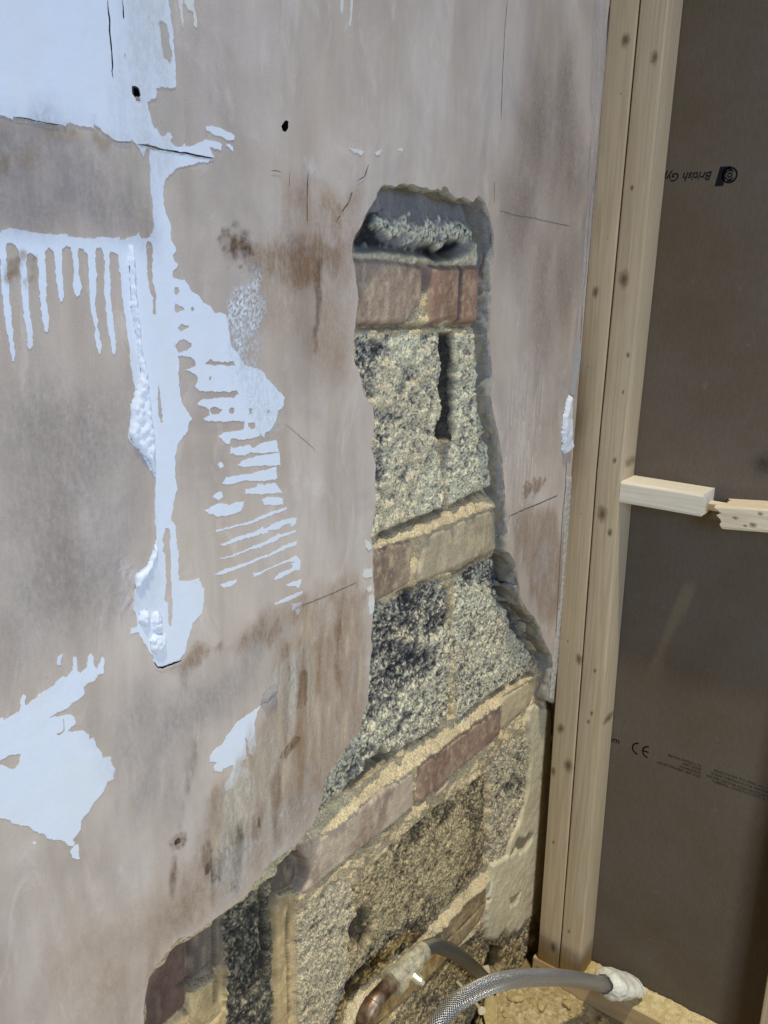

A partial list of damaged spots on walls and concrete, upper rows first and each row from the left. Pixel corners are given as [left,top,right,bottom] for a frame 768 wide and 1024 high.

peeling [0,653,115,859]
peeling [0,0,303,667]
damp [211,611,362,895]
spalling [143,183,572,1024]